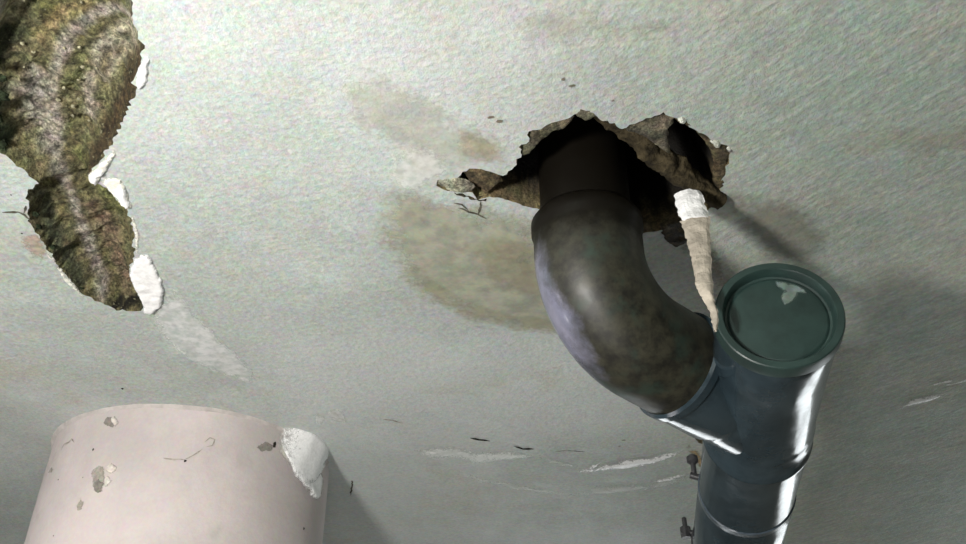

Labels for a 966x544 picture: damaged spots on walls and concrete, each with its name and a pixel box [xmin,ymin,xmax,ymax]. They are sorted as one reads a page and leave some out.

spalling [0,0,164,314]
spalling [436,109,733,247]
spalling [258,427,329,500]